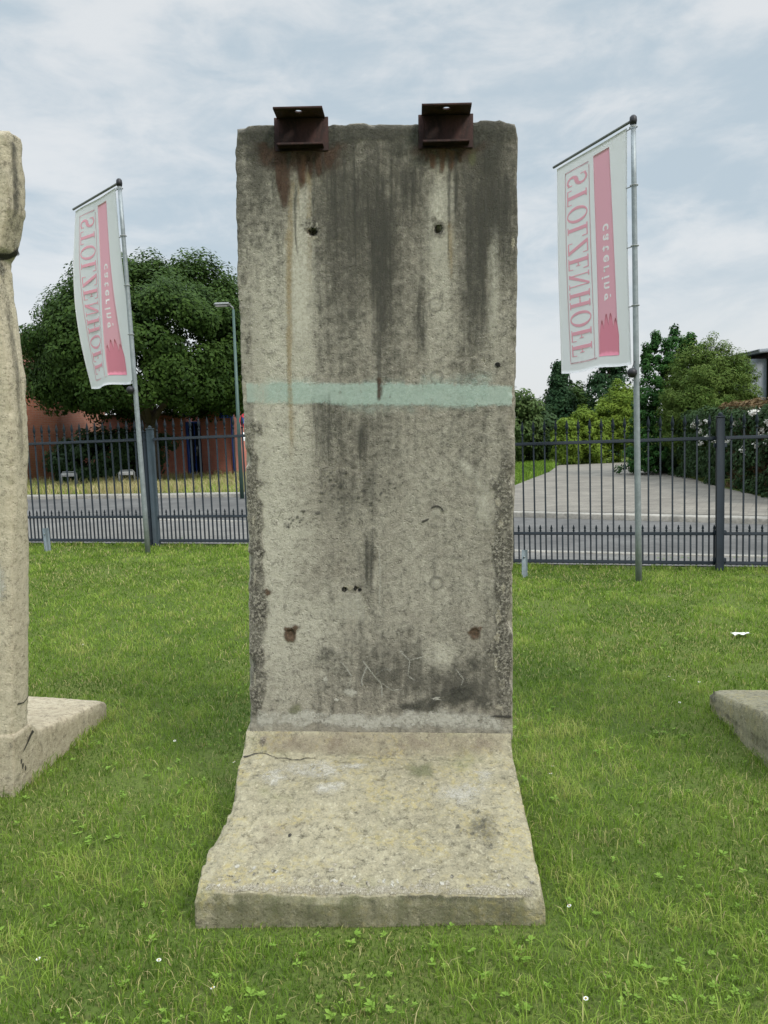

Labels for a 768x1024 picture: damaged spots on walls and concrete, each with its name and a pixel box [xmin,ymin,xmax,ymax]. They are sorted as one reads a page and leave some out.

corrosion [257,142,342,206]
damp [431,188,451,258]
damp [289,189,315,344]
damp [257,710,500,730]